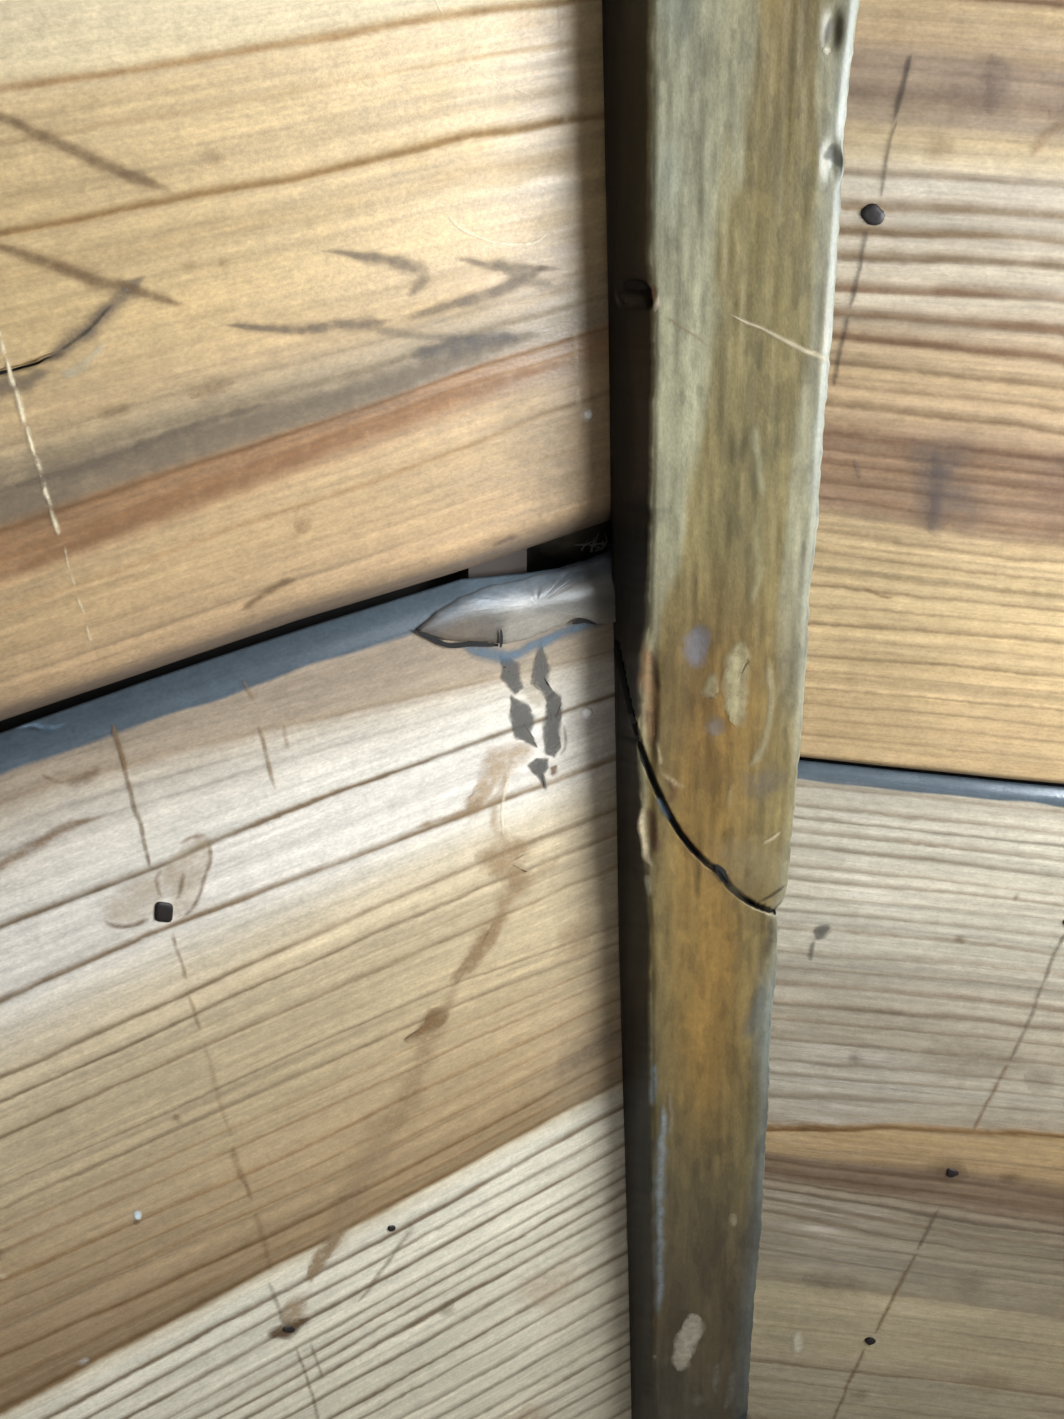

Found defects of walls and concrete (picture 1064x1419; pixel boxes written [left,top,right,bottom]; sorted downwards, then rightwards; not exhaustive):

crack [0,280,140,392]
crack [414,629,503,648]
crack [572,618,783,913]
damp [405,1011,446,1040]
damp [309,1171,368,1279]